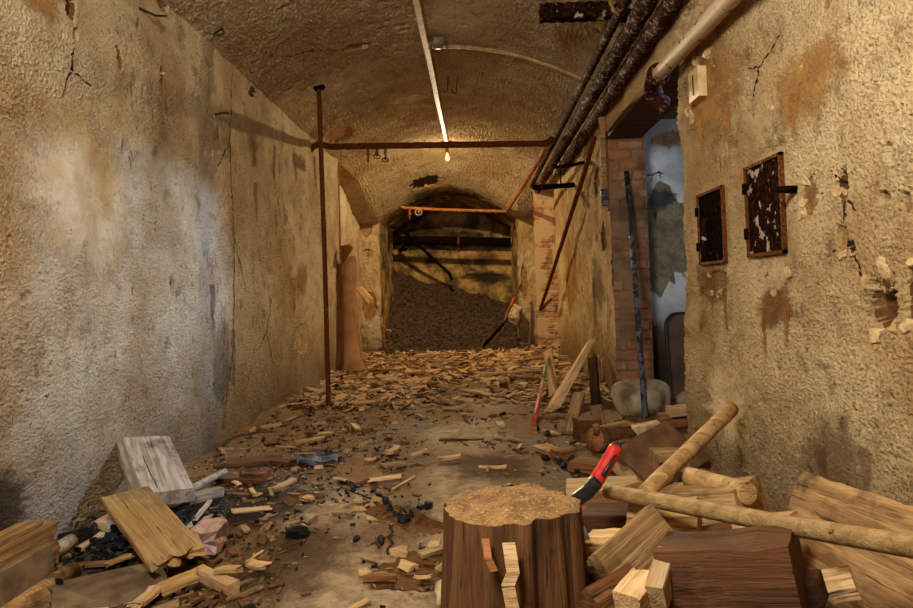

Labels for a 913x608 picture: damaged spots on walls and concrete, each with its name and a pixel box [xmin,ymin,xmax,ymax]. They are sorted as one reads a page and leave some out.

crack [748,33,781,97]
peeling [647,181,687,298]
crack [830,170,862,276]
flaking render [860,256,913,343]